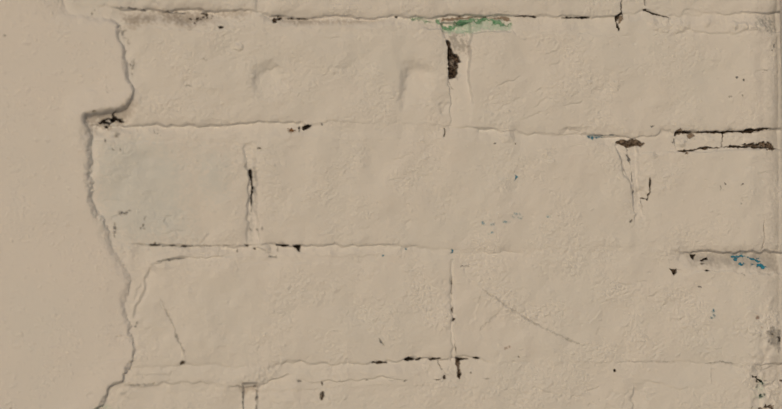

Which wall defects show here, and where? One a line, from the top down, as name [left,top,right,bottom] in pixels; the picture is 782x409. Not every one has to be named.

spalling [445,32,473,79]
spalling [99,111,123,129]
crack [672,128,774,152]
crack [587,133,651,200]
crack [246,170,254,203]
crack [149,243,192,261]